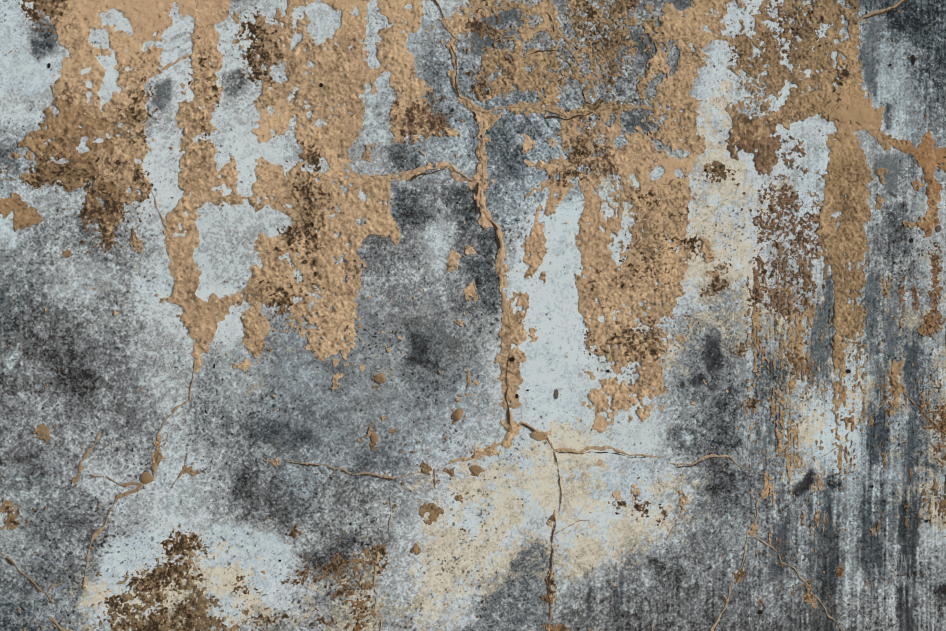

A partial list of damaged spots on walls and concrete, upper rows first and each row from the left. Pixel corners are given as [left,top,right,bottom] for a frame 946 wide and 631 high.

crack [857,0,909,23]
peeling [0,216,17,249]
peeling [135,267,175,306]
crack [308,0,659,323]
crack [0,360,195,631]
crack [263,356,843,631]